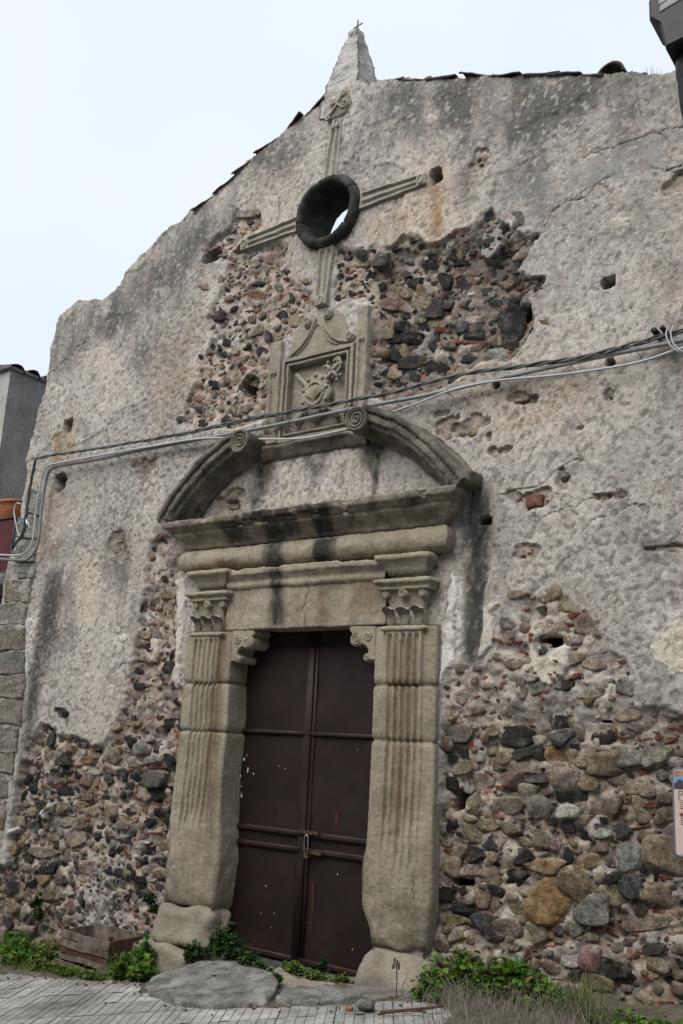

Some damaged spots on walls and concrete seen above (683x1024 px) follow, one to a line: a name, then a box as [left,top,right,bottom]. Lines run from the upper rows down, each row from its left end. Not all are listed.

crack [544,125,683,227]
spalling [202,245,223,264]
spalling [240,373,260,398]
flaking render [494,382,540,407]
flaking render [505,466,573,511]
flaking render [105,527,129,563]
leakage [221,461,335,624]
peeling [150,577,188,688]
peeling [439,572,459,683]
peeling [478,577,501,657]
peeling [529,631,572,684]
peeling [651,610,683,674]